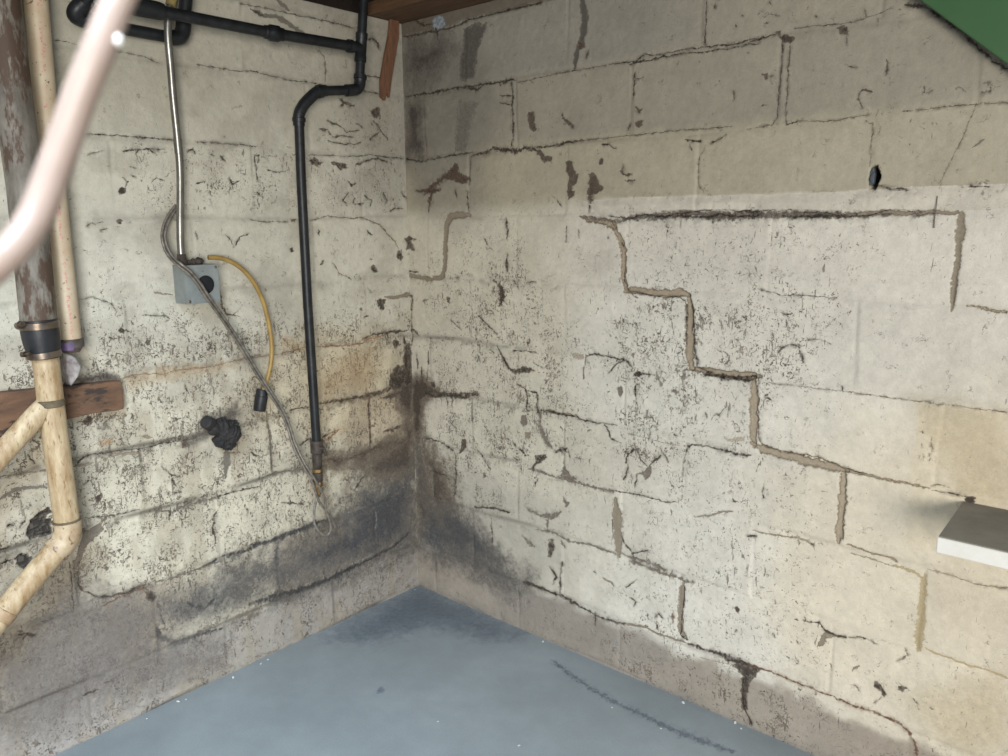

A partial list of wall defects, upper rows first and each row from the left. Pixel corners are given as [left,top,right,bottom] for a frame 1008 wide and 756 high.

crack [124,212,471,378]
crack [309,1,1008,679]
crack [69,375,510,654]
damp [172,376,532,618]
crack [748,665,918,756]